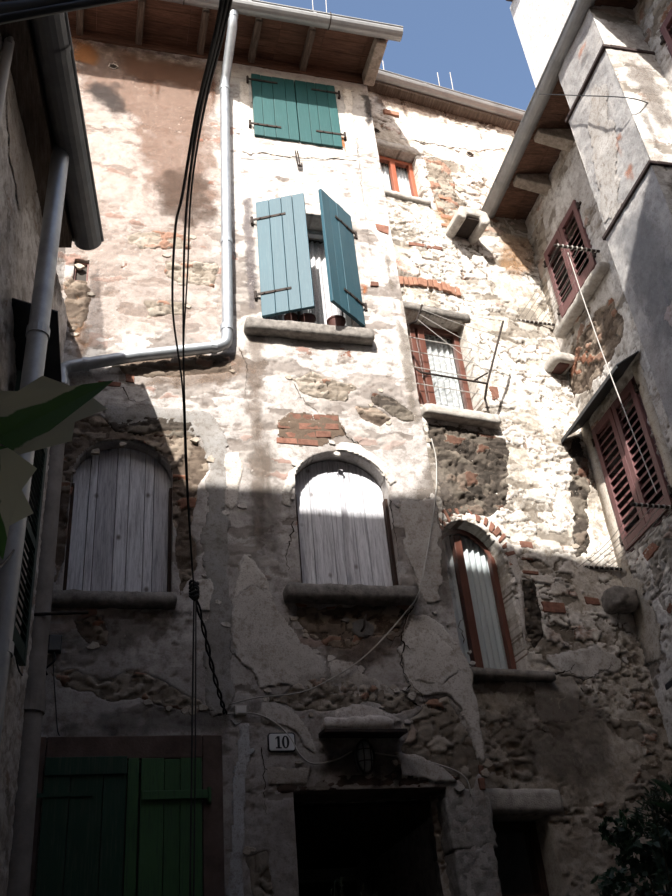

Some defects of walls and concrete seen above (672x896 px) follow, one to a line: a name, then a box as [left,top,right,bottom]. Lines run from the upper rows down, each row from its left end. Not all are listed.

water stain [76,45,216,200]
flaking render [126,231,219,288]
flaking render [64,263,95,337]
flaking render [143,300,191,318]
flaking render [285,371,414,427]
flaking render [276,412,345,457]
flaking render [54,415,215,595]
crack [390,606,434,717]
flaking render [51,669,209,715]